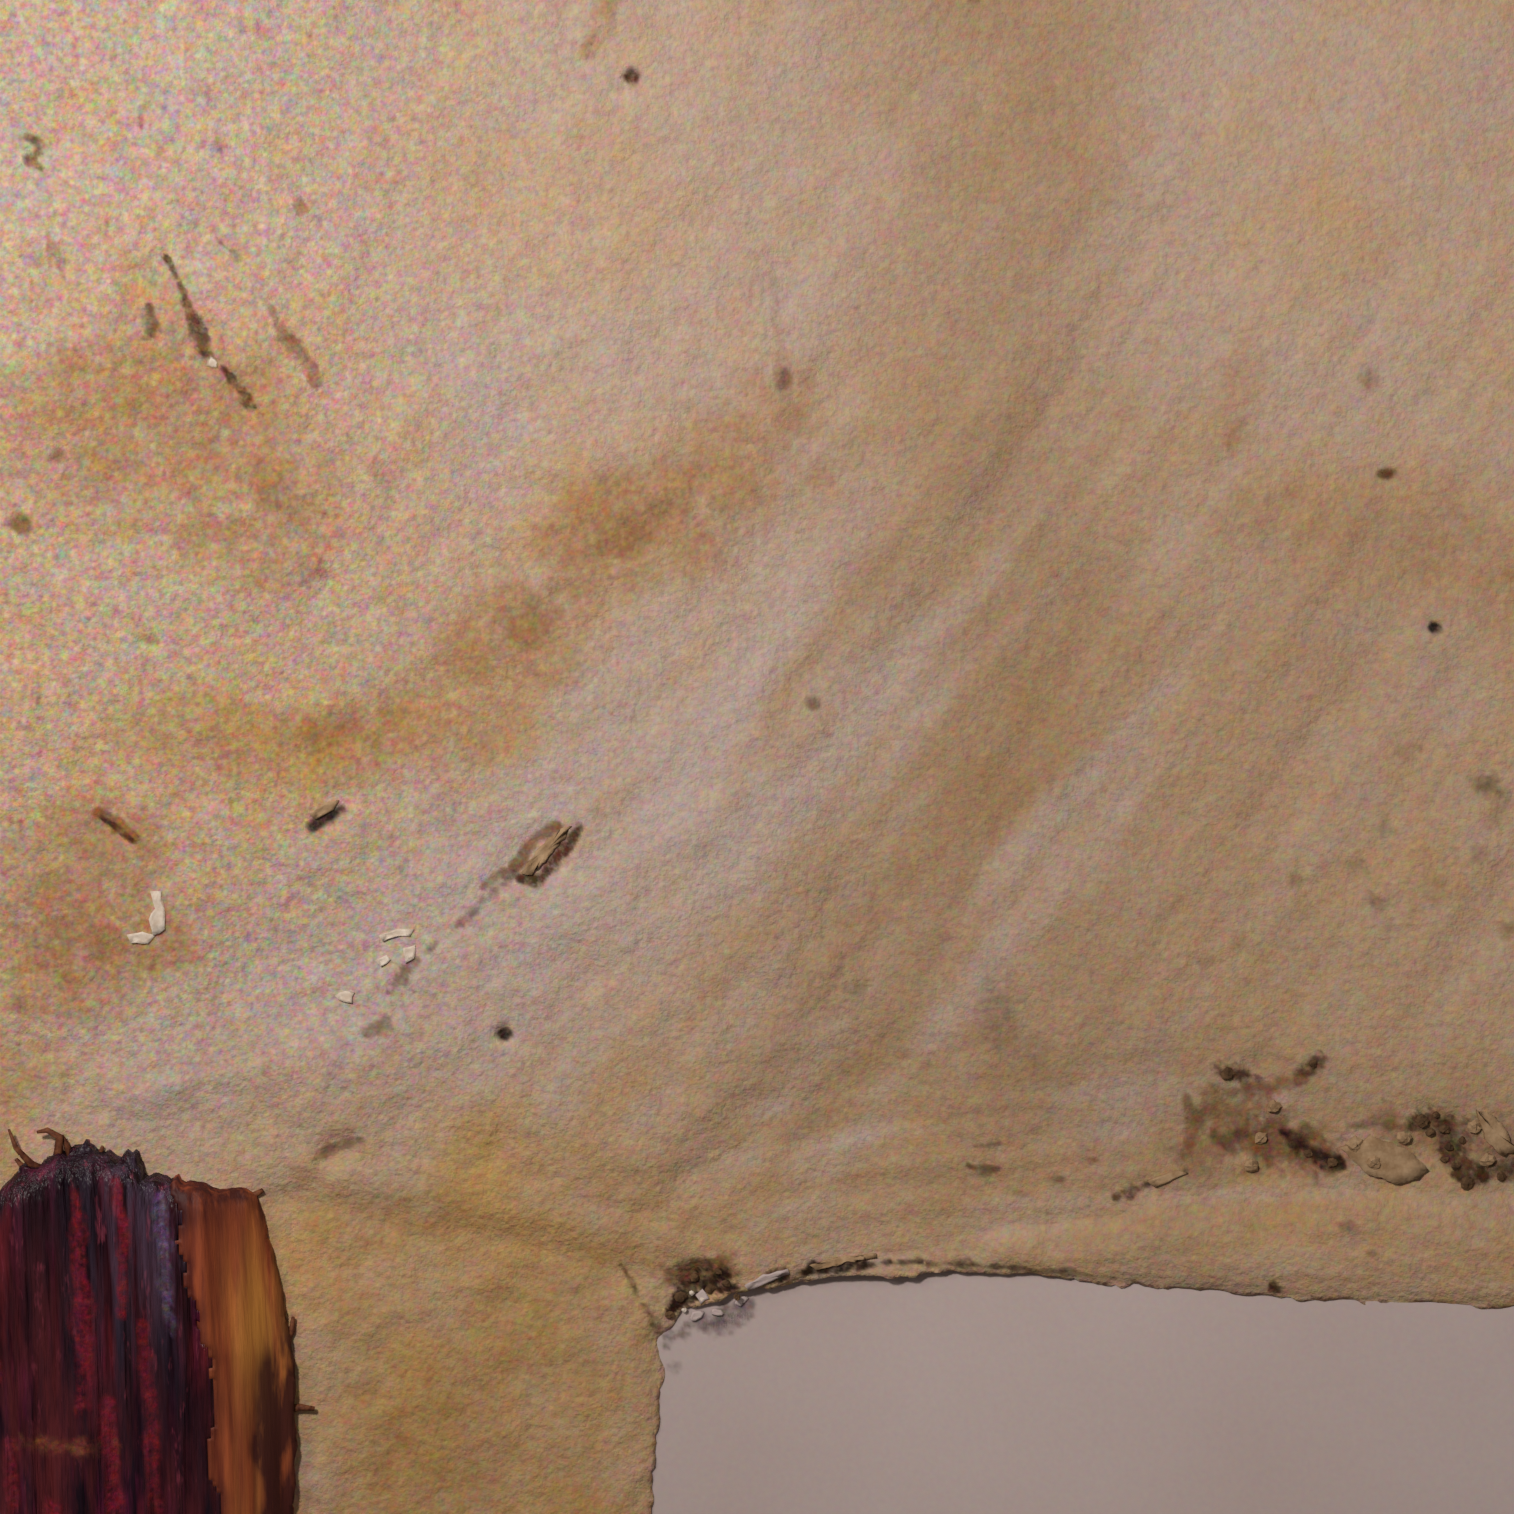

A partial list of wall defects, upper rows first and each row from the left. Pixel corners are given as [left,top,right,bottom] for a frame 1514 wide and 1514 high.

flaking render [509,821,581,887]